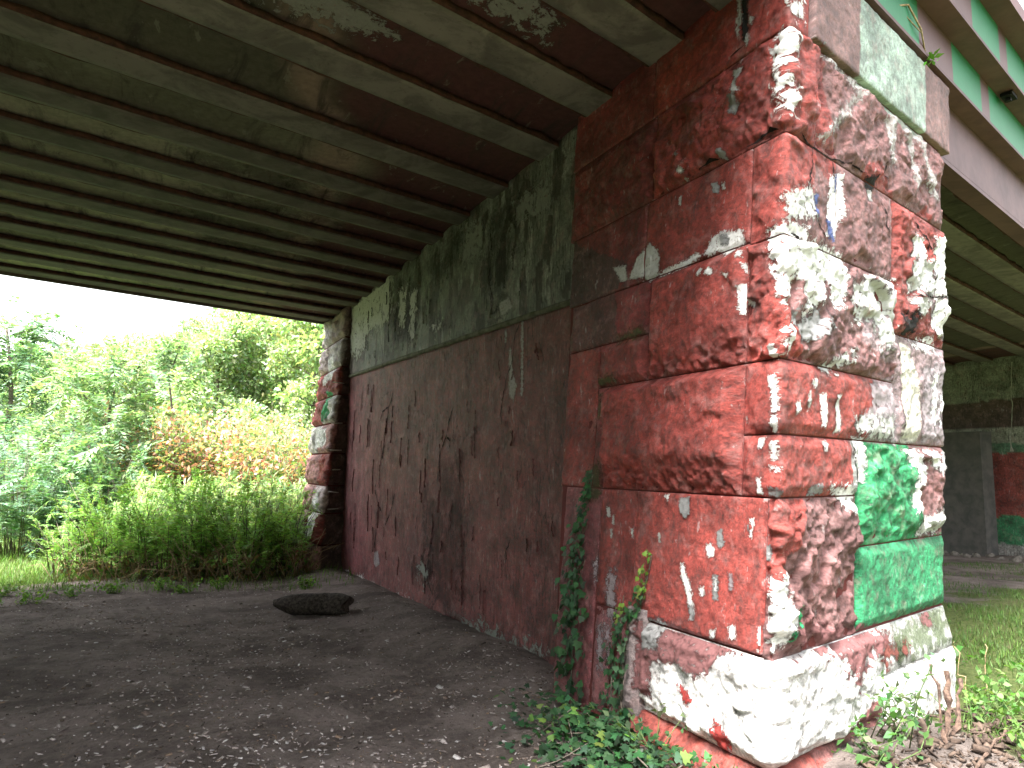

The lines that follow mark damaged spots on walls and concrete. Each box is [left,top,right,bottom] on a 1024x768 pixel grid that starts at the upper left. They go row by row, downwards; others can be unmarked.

peeling [245,0,401,42]
peeling [468,0,566,48]
peeling [768,0,807,120]
peeling [613,227,756,315]
peeling [756,172,951,538]
crack [374,393,395,548]
peeling [664,493,690,518]
peeling [629,562,912,712]
peeling [919,604,932,628]
peeling [708,717,734,755]